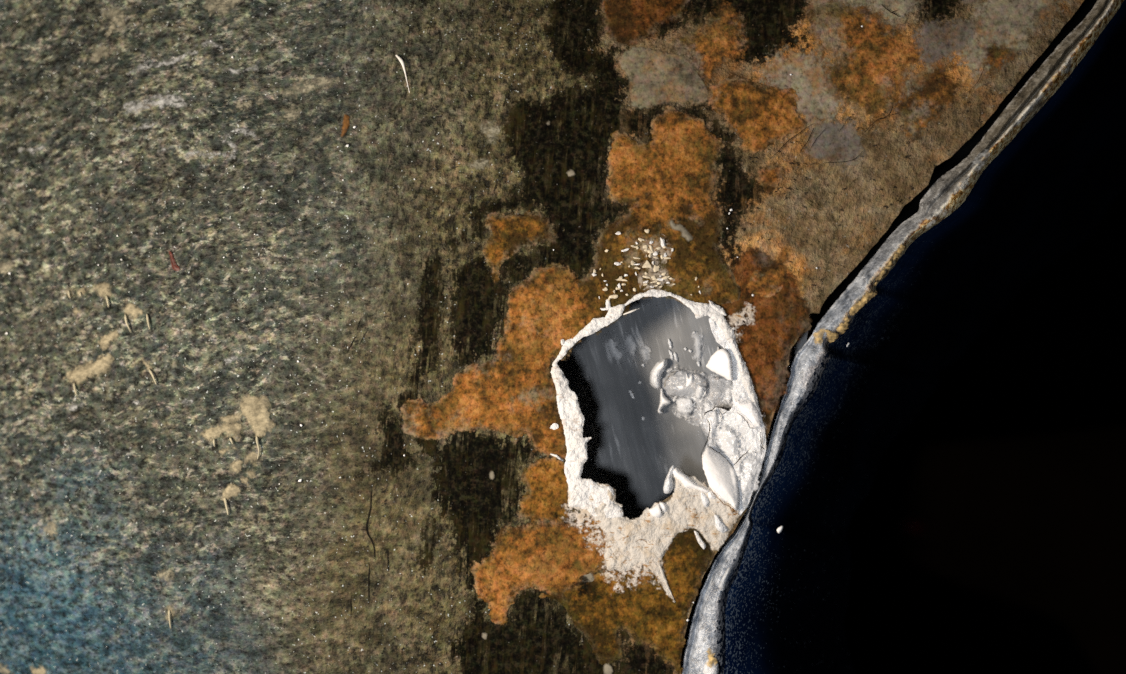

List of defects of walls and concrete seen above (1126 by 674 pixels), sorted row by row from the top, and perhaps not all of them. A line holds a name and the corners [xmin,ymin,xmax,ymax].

corrosion [807,1,958,140]
corrosion [983,43,1019,77]
damp [445,203,495,253]
corrosion [400,0,811,674]
damp [355,255,550,674]
spalling [550,229,763,603]
damp [574,576,601,601]